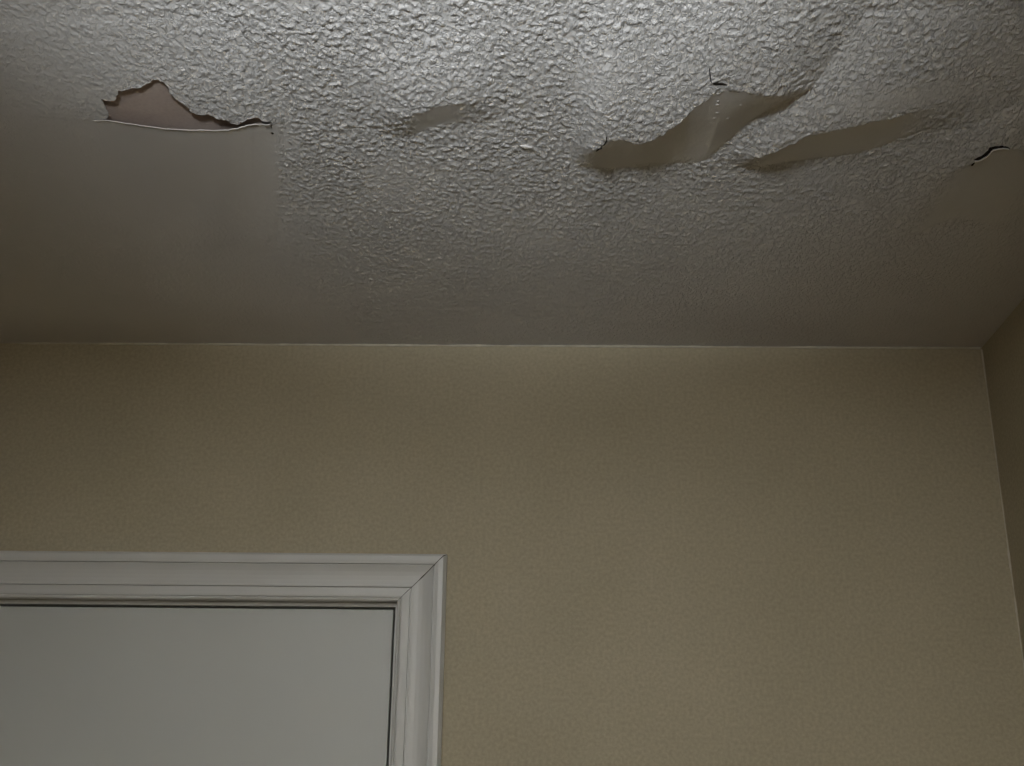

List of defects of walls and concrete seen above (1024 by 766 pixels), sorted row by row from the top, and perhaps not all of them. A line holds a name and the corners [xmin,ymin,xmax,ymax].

crack [971,146,1010,166]